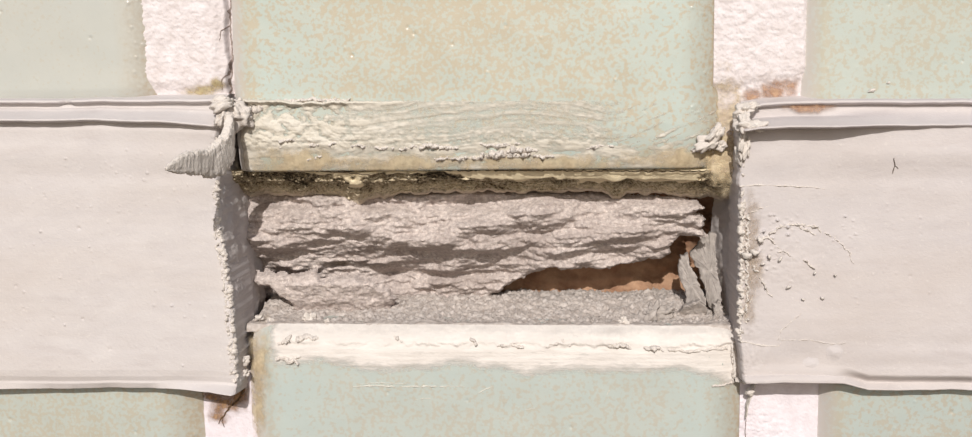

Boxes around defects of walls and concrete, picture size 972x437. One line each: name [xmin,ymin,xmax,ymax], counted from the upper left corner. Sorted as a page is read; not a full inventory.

peeling [275,97,350,107]
peeling [351,142,555,162]